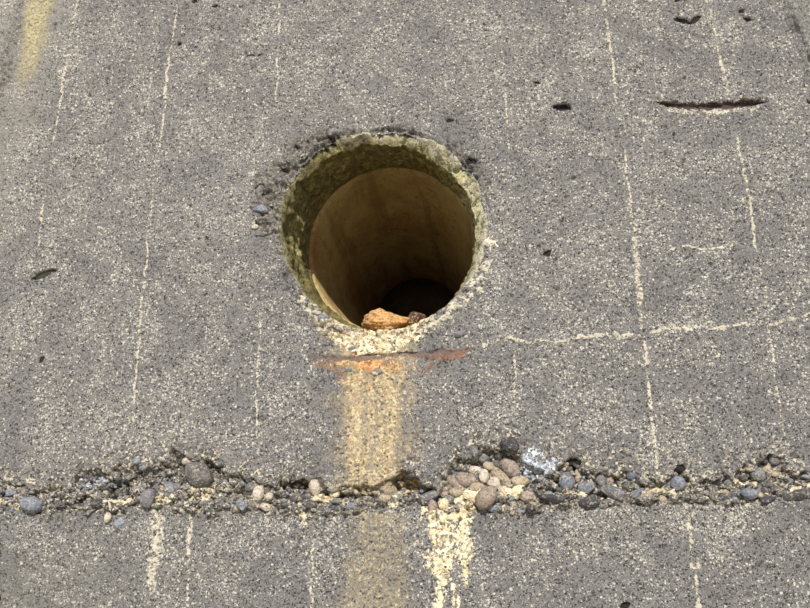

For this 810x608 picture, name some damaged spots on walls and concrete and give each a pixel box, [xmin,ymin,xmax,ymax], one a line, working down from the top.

rust [330,318,433,493]
damp [420,499,477,608]